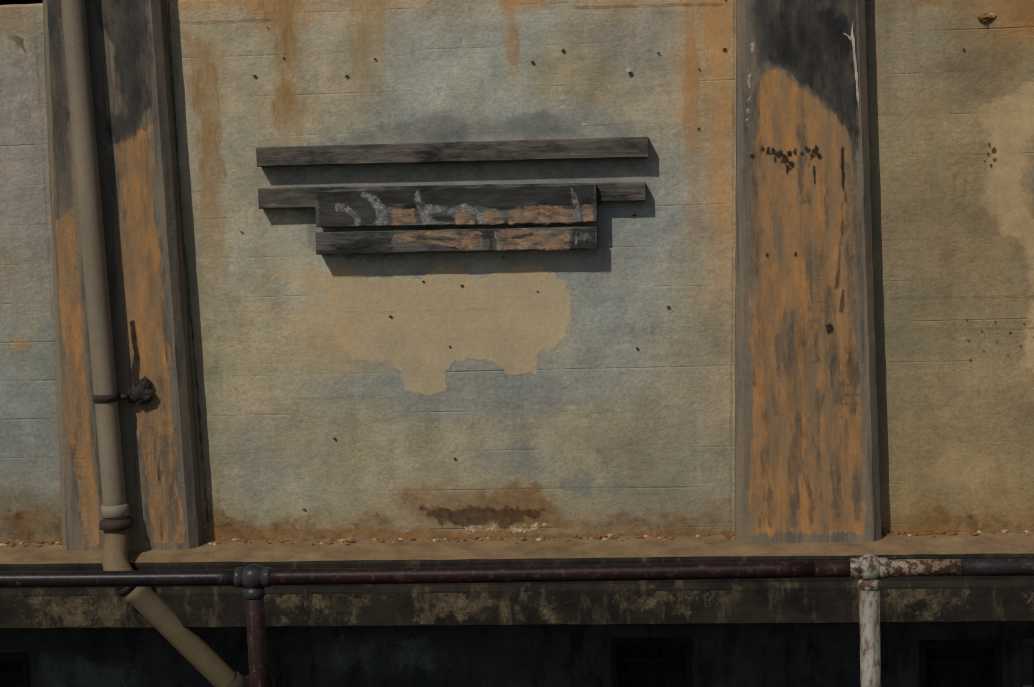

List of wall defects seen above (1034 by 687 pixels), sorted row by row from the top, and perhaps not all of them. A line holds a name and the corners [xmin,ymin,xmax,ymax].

leakage [100,0,151,140]
corrosion [56,222,85,411]
corrosion [72,125,183,542]
corrosion [749,70,865,537]